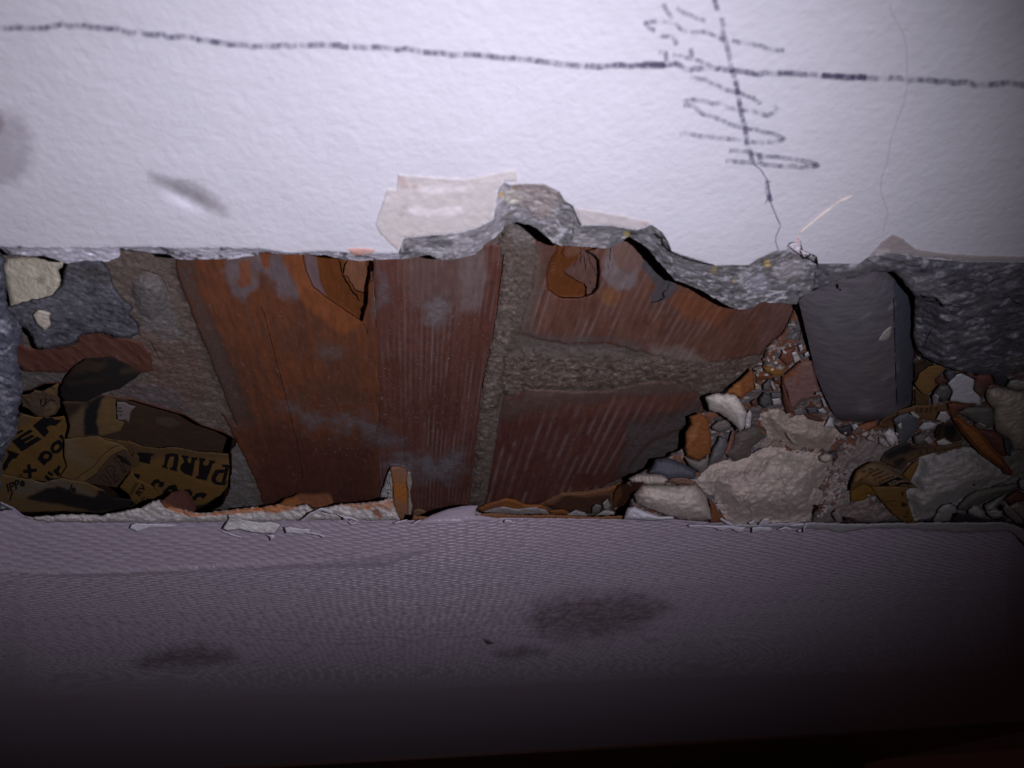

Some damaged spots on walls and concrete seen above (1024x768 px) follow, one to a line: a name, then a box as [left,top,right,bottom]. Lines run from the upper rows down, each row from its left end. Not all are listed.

crack [754,164,781,251]
peeling [868,234,1024,261]
peeling [0,170,818,489]
flaking render [816,392,834,428]
peeling [911,373,981,445]
flaking render [879,423,902,448]
peeling [267,508,359,541]